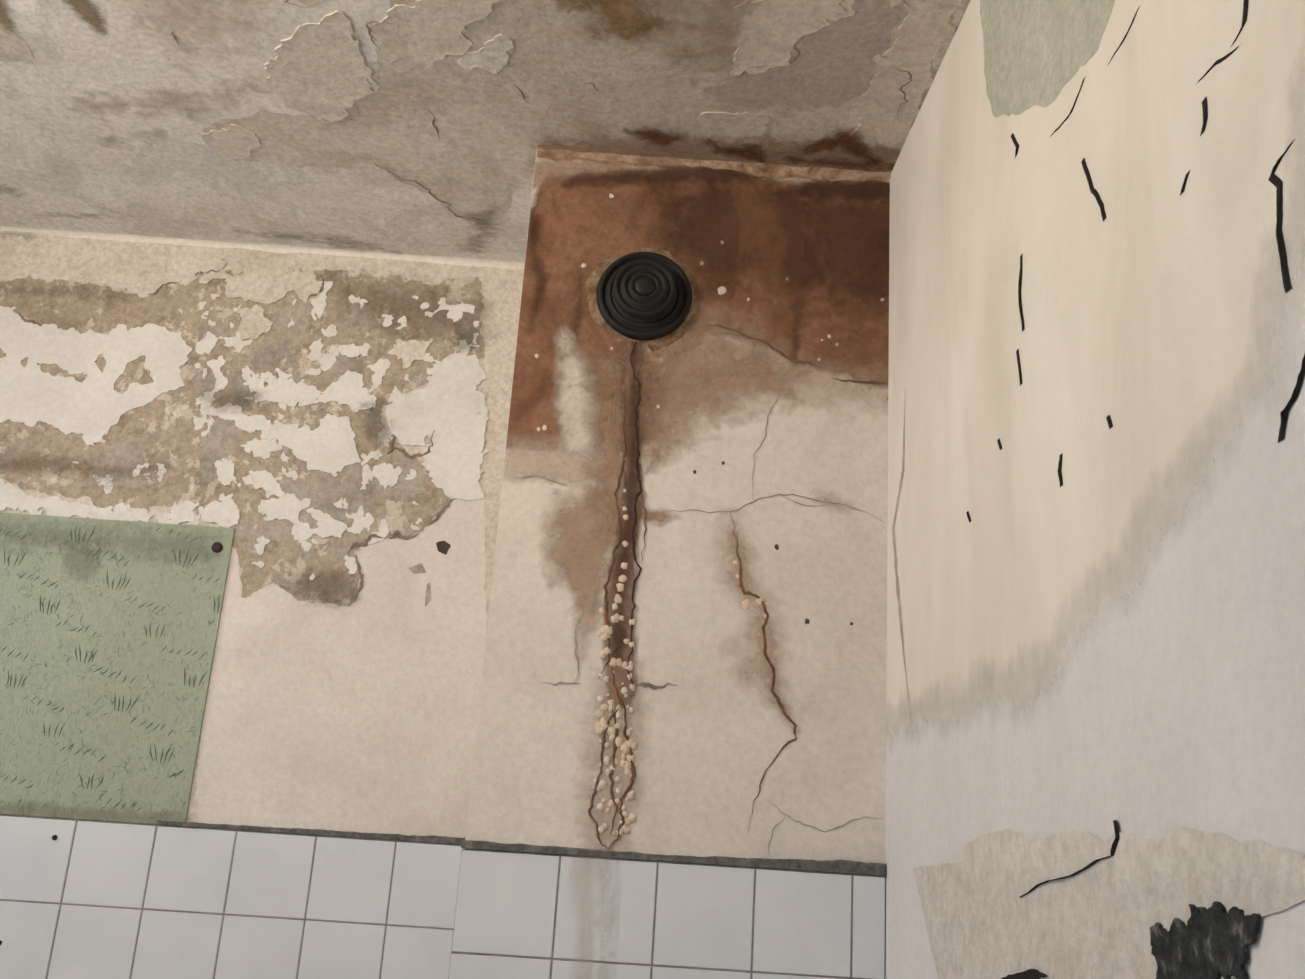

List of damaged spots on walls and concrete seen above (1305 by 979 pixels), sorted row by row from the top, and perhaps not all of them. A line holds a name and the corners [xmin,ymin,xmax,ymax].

peeling [0,14,35,62]
crack [1197,0,1249,136]
crack [1081,158,1107,221]
crack [1268,139,1295,294]
peeling [0,257,489,607]
peeling [201,0,1305,733]
crack [1016,253,1025,386]
crack [1056,453,1064,487]
crack [1278,354,1305,442]
crack [636,357,912,856]
spalling [1001,969,1048,979]
spalling [1150,901,1261,979]